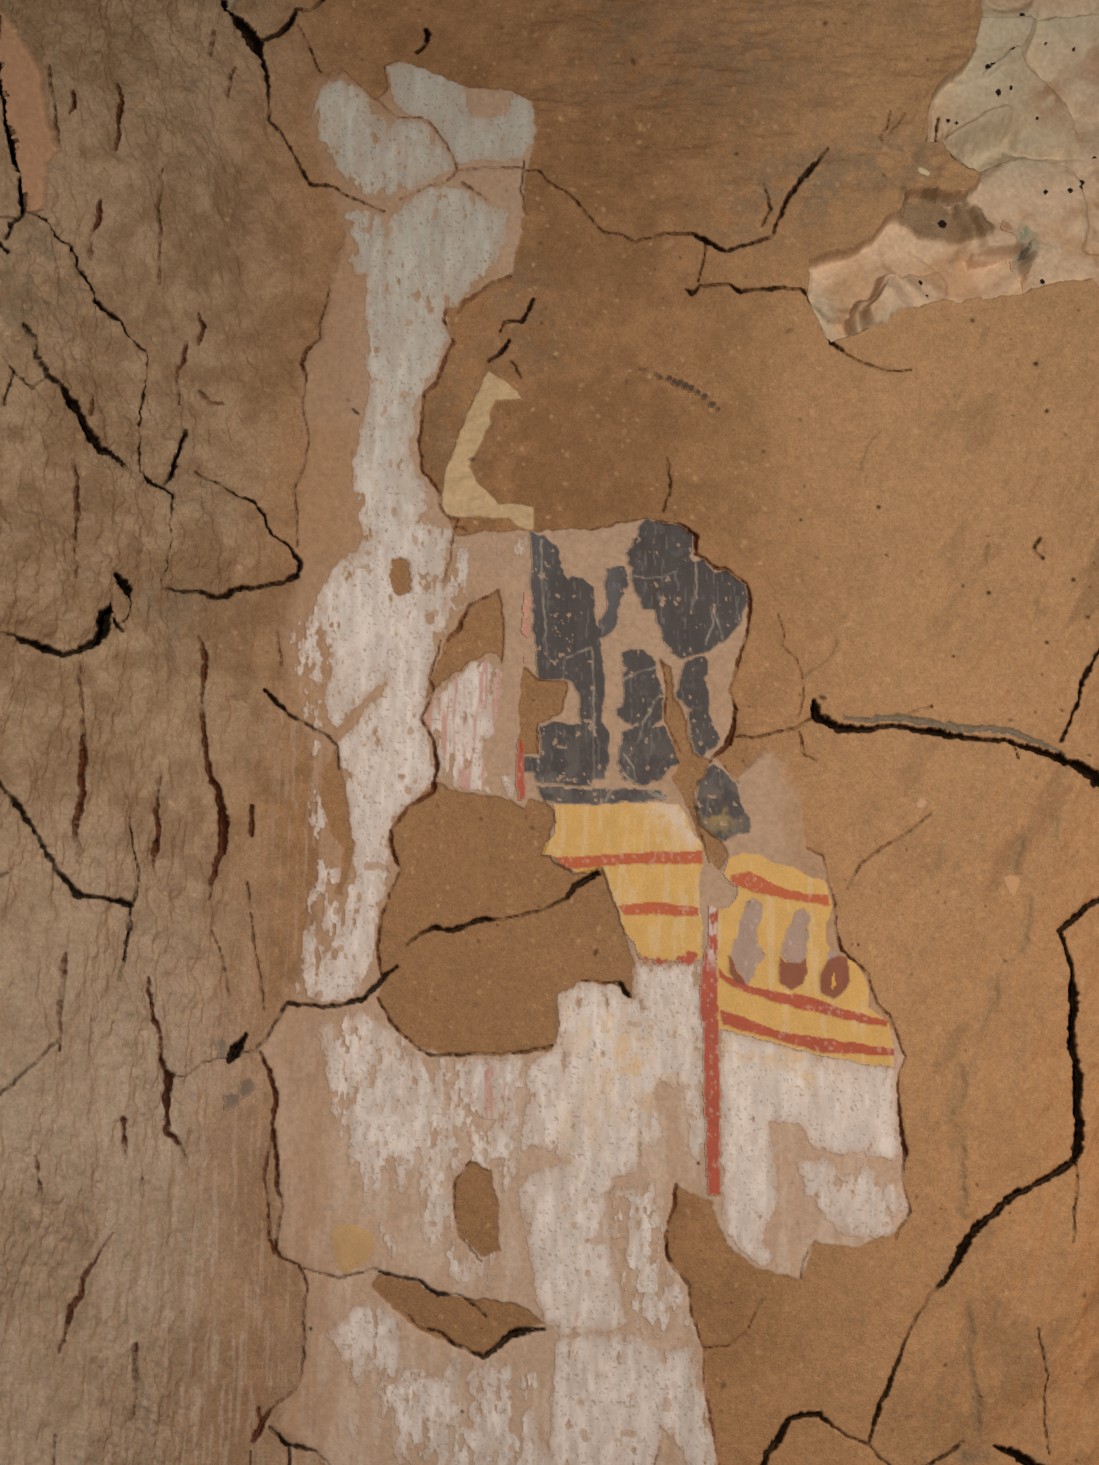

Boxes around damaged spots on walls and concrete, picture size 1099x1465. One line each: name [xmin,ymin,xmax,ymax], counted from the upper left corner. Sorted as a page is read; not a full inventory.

crack [208,0,828,304]
crack [828,339,911,372]
crack [0,61,600,1465]
crack [688,806,710,863]
crack [590,458,1099,788]
crack [580,979,630,998]
crack [807,814,932,1241]
crack [664,1183,763,1465]
crack [761,898,1099,1465]